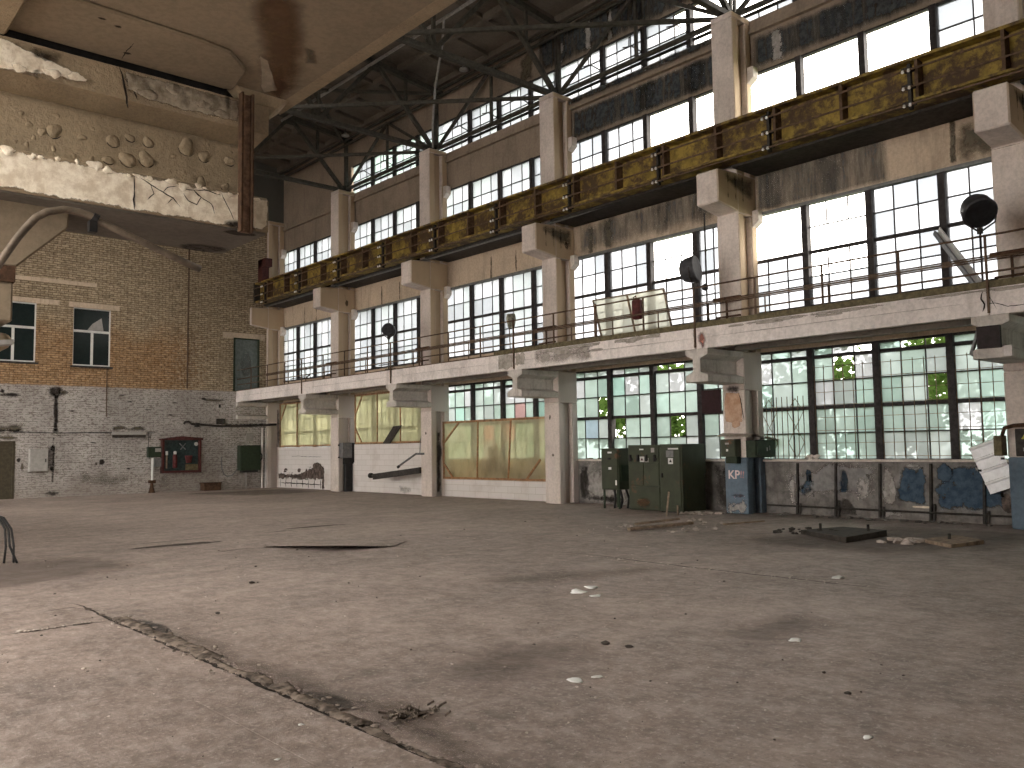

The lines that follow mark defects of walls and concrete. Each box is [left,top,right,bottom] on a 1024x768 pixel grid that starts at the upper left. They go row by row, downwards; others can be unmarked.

peeling [0,38,87,82]
crack [119,43,138,107]
spalling [126,72,239,121]
damp [568,38,713,137]
damp [950,121,991,162]
peeling [0,145,238,224]
crack [133,177,234,219]
peeling [253,198,268,229]
damp [727,142,885,210]
peeling [725,393,742,428]
spalling [279,462,324,489]
peeling [789,463,1011,517]